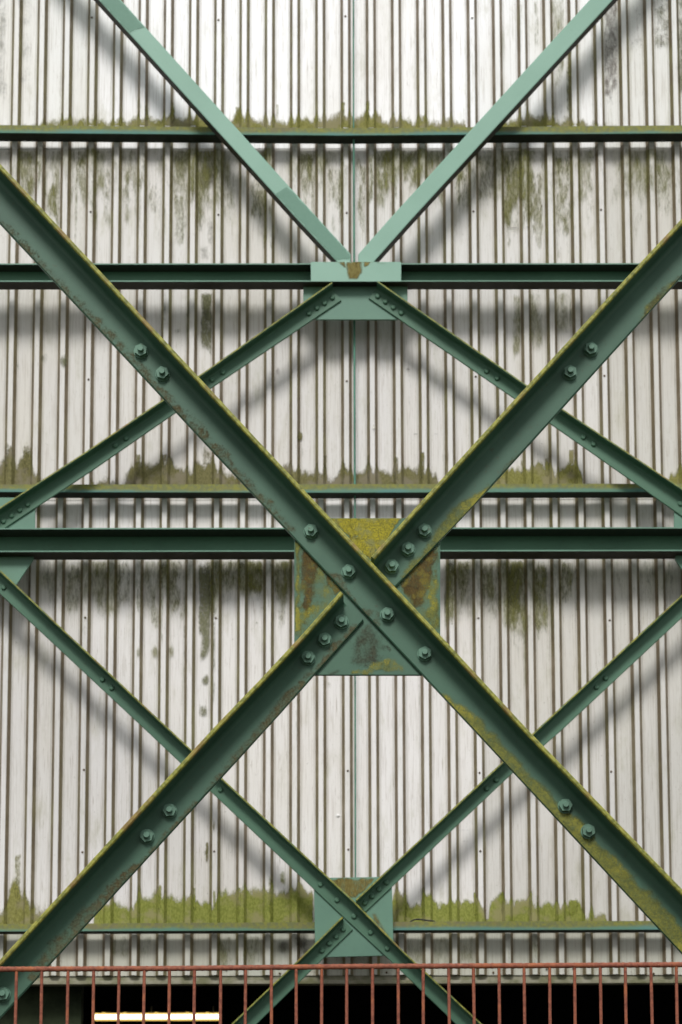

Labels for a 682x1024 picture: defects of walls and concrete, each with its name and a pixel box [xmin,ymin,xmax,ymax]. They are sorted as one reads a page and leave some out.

corrosion [340,262,370,279]
corrosion [301,551,340,612]
corrosion [402,548,437,607]